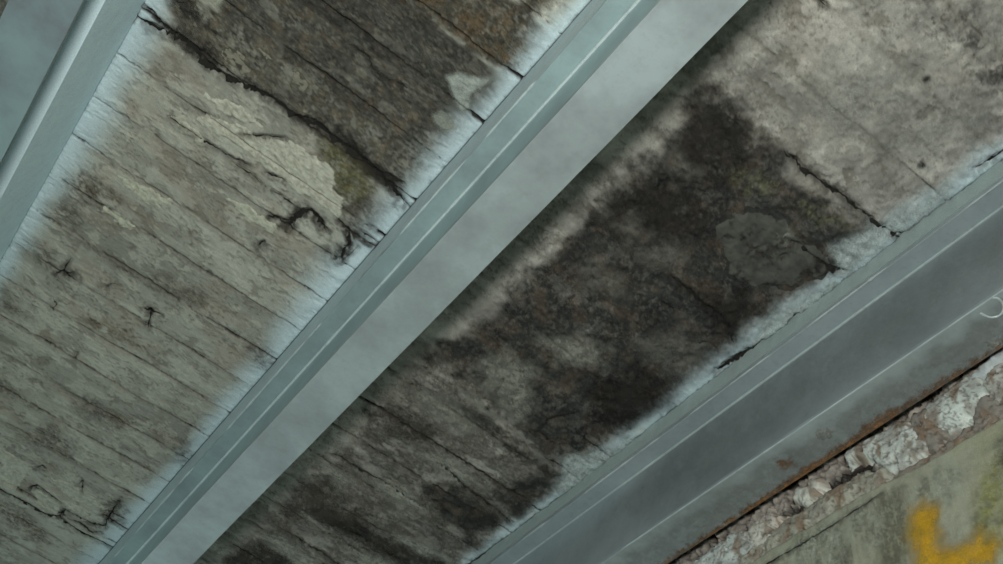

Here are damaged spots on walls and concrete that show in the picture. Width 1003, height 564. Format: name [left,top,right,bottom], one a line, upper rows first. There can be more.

crack [137,0,411,204]
damp [979,67,1003,85]
crack [172,118,384,264]
crack [784,151,917,237]
damp [224,85,952,564]
crack [0,465,127,545]
corrosion [665,346,1002,564]